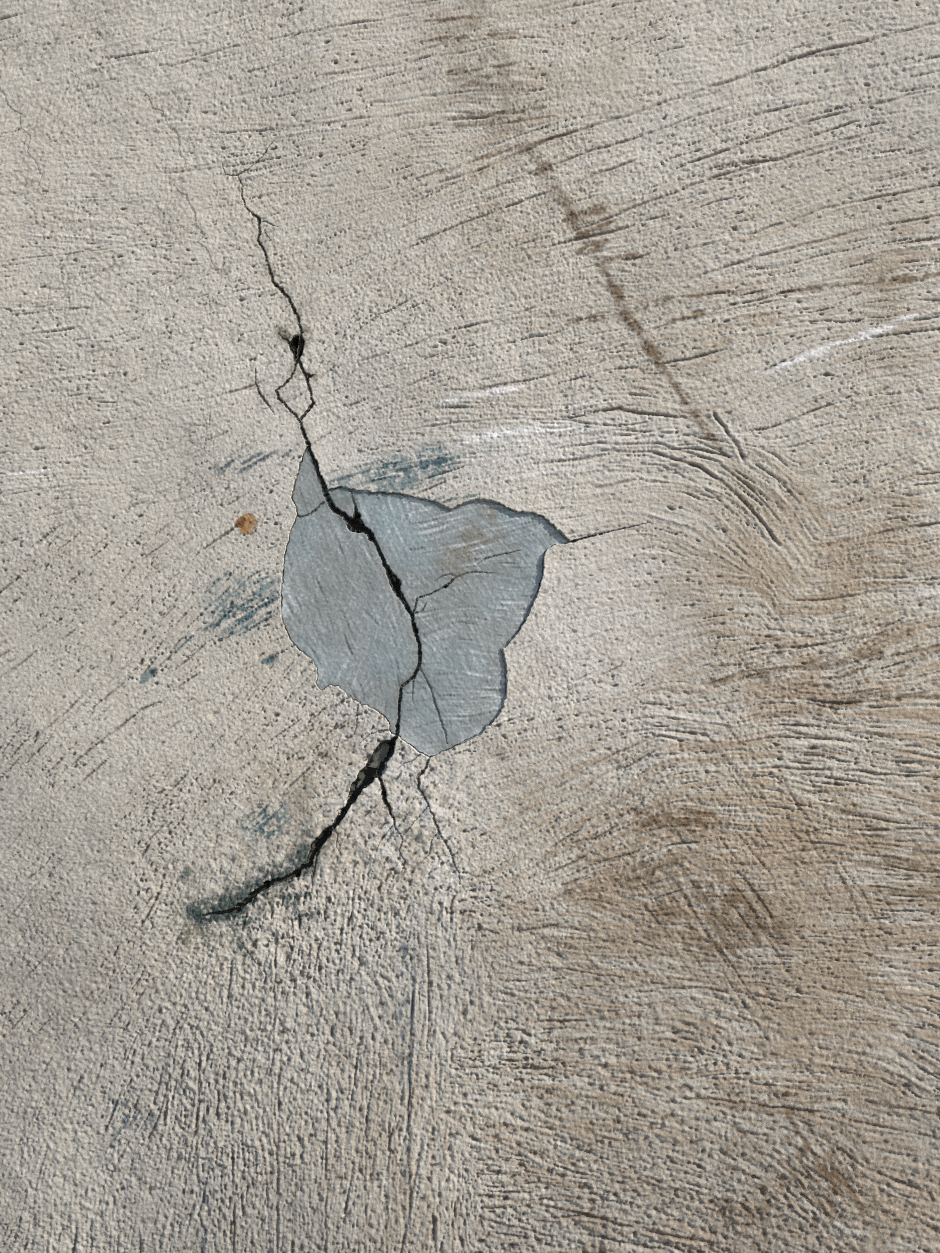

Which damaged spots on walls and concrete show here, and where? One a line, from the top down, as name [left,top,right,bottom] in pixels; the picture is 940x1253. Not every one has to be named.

corrosion [235,514,257,534]
crack [204,138,520,975]
peeling [280,446,573,758]